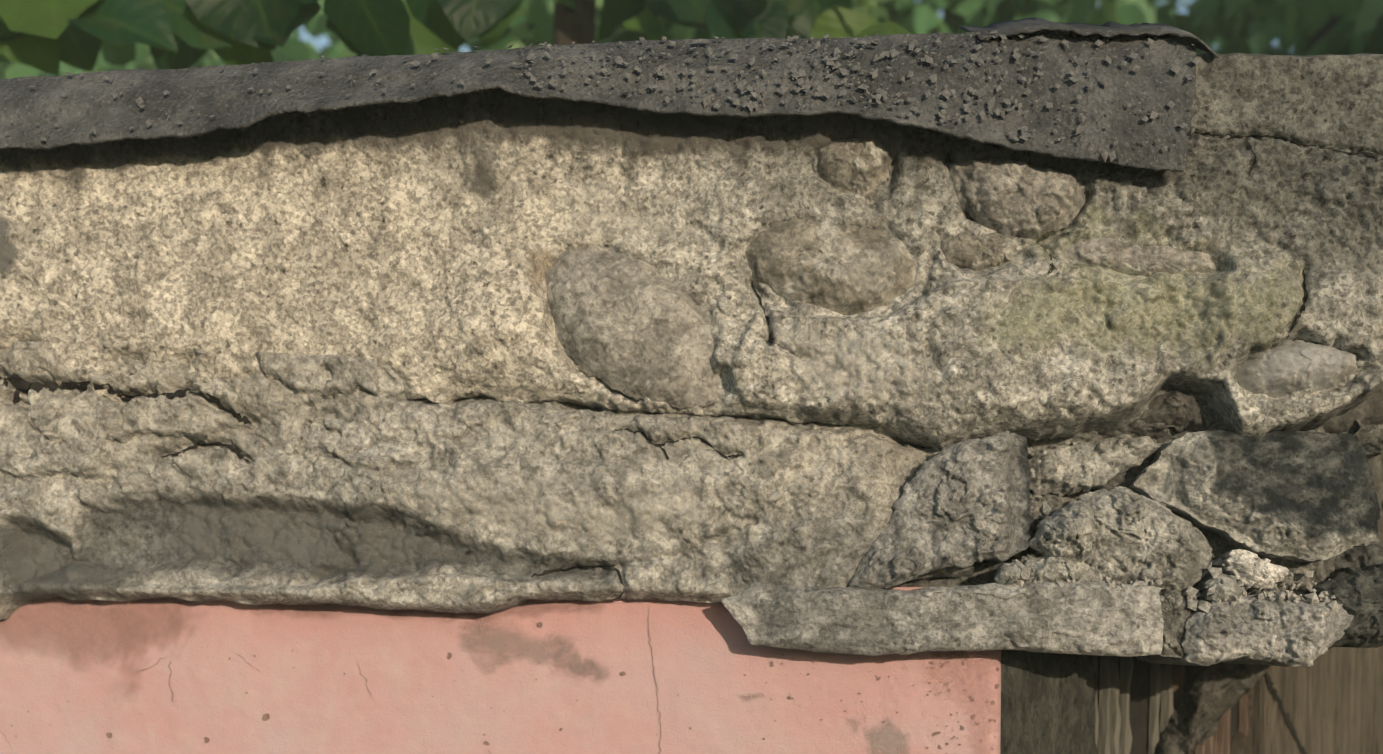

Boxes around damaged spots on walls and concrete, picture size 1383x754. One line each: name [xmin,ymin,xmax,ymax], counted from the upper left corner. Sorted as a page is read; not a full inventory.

crack [1189,131,1383,177]
crack [615,428,742,460]
crack [532,565,662,754]